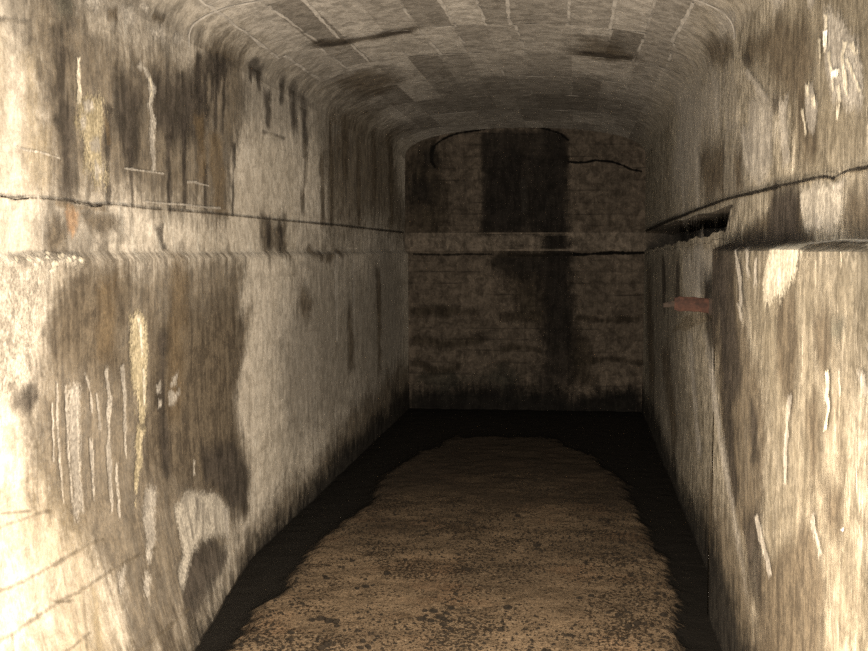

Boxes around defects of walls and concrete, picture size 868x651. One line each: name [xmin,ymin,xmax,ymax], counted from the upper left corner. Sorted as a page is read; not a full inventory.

leakage [28,0,308,221]
crack [0,195,404,234]
leakage [320,109,446,234]
crack [413,164,868,257]
leakage [18,130,868,651]